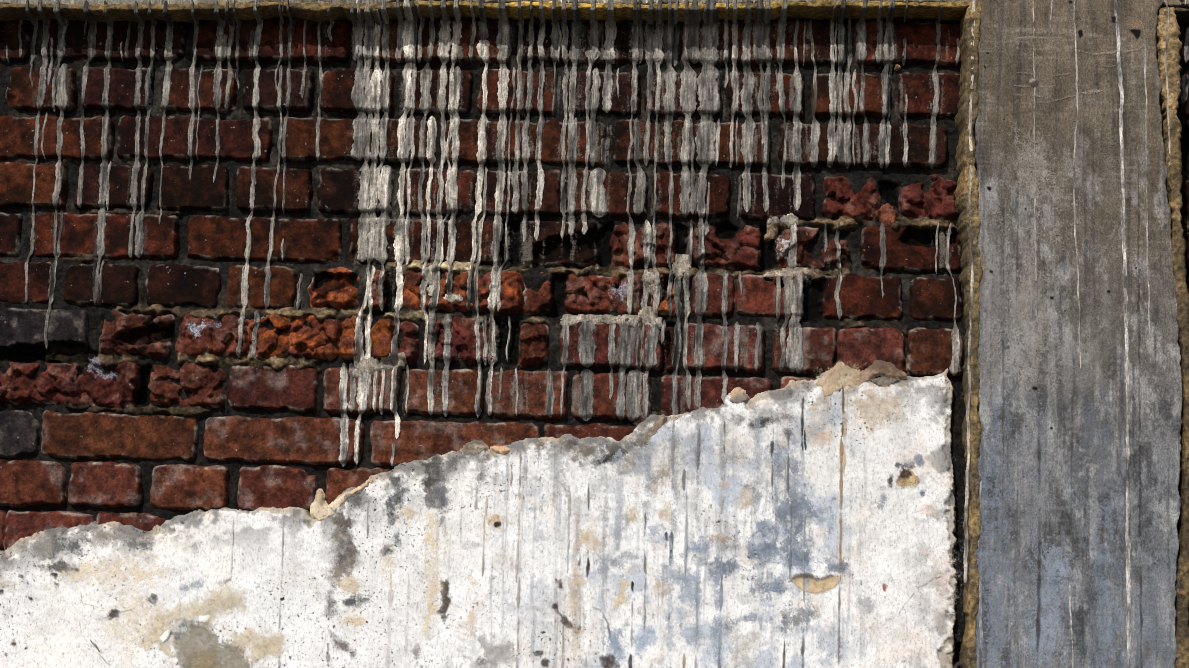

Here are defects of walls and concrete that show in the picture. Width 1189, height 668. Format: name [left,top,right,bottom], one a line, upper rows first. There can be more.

damp [6,0,174,349]
damp [187,0,335,359]
damp [339,0,918,668]
flaking render [730,387,750,403]
flaking render [816,360,908,397]
flaking render [460,440,511,455]
flaking render [310,479,372,521]
flaking render [878,454,925,509]
damp [32,526,284,668]
damp [326,494,369,625]
peeling [792,573,840,593]
damp [327,639,356,661]